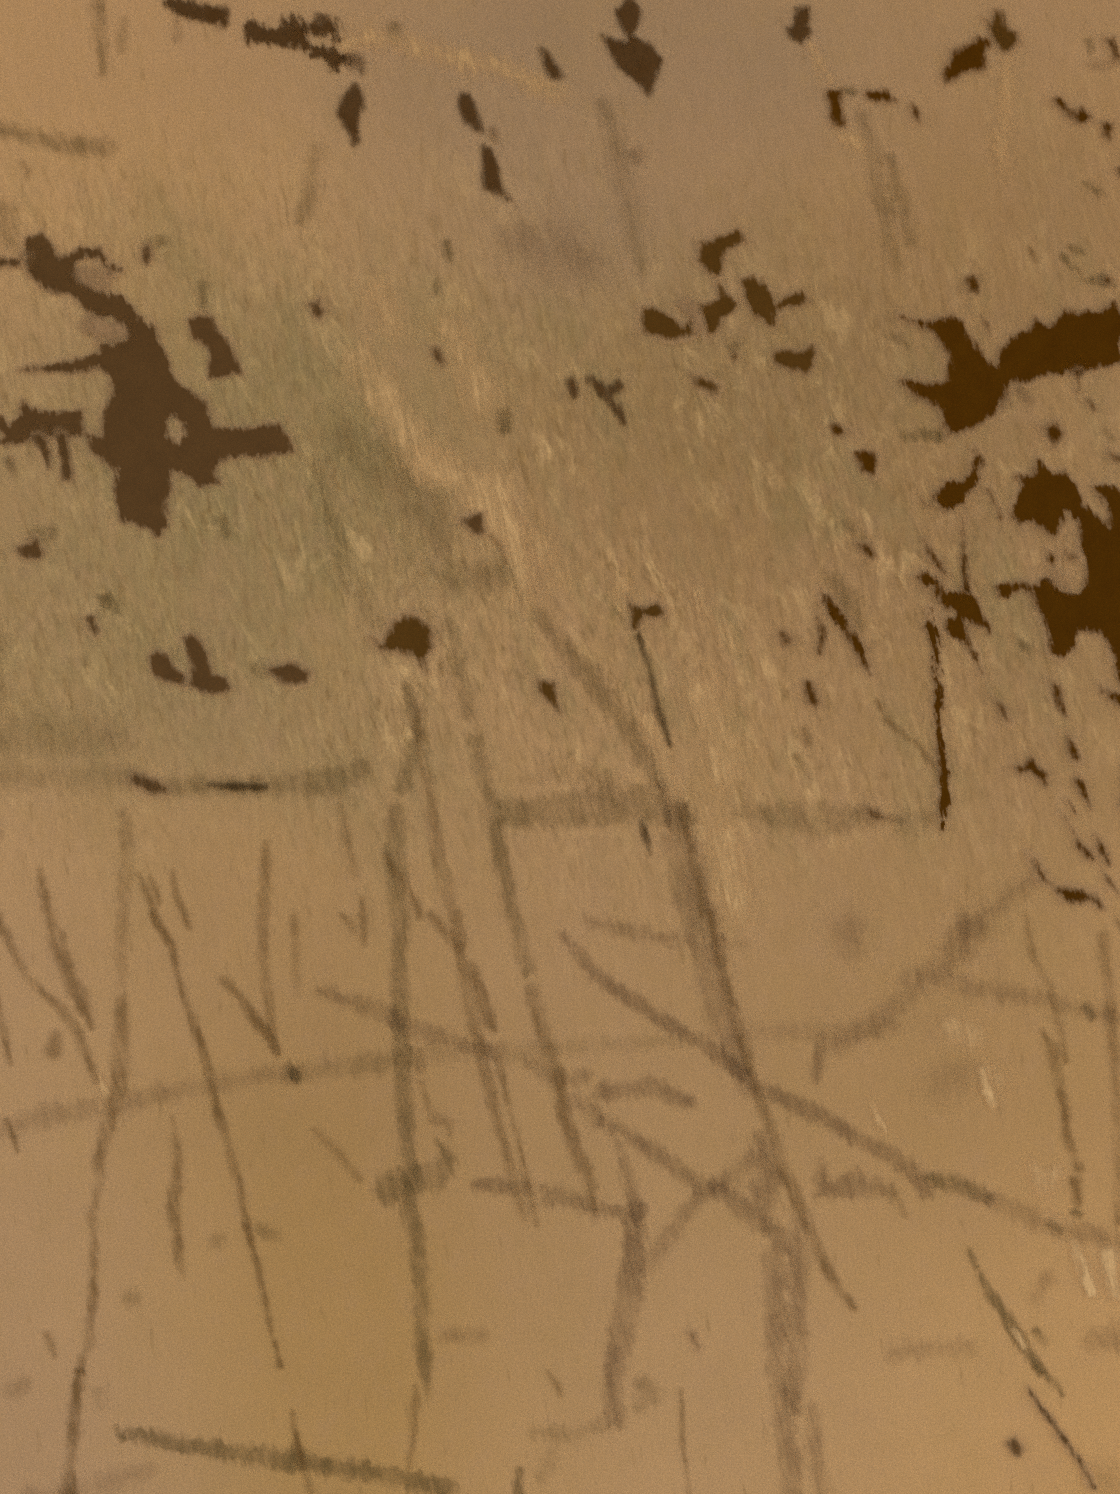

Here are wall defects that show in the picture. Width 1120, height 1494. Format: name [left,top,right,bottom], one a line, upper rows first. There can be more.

peeling [163,0,352,72]
peeling [602,0,662,96]
peeling [942,8,1020,84]
peeling [338,83,363,145]
peeling [641,228,811,341]
peeling [0,231,294,539]
peeling [899,274,1120,514]
peeling [149,633,231,696]
peeling [371,613,435,675]
peeling [916,527,992,675]
peeling [995,420,1120,707]
peeling [1051,680,1118,892]